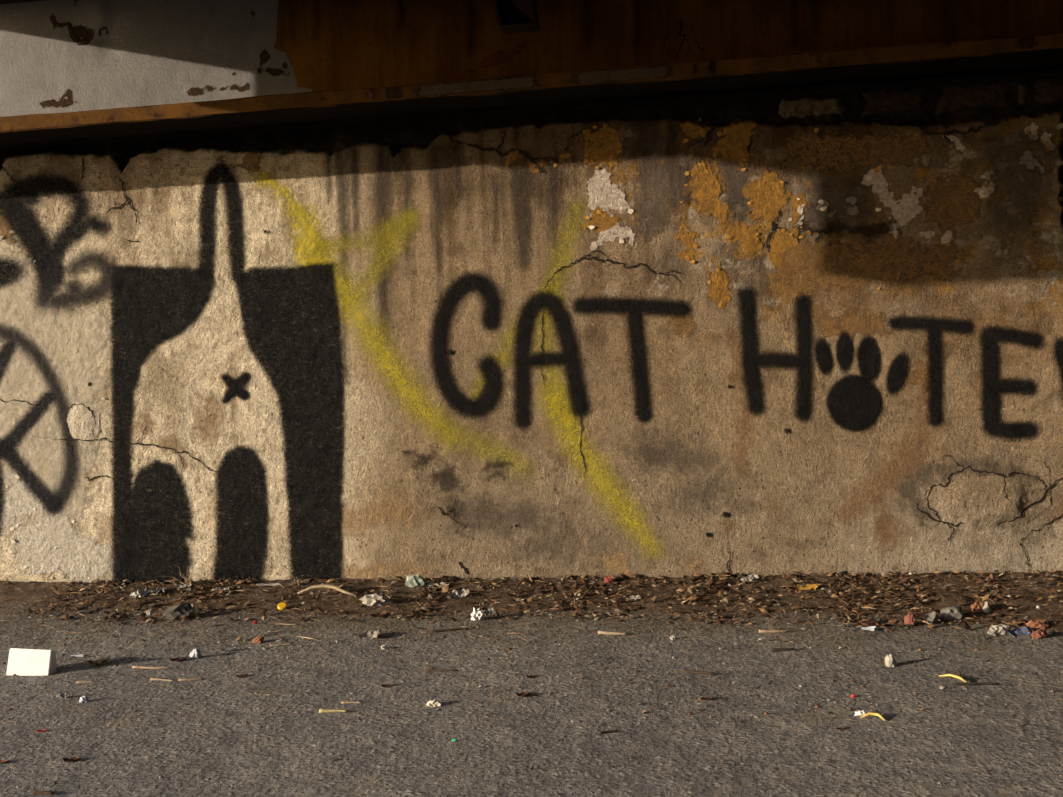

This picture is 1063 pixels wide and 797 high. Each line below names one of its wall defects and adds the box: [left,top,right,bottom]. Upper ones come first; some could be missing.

corrosion [40,89,76,108]
corrosion [50,14,109,45]
corrosion [187,72,250,96]
water stain [326,145,358,355]
water stain [375,144,410,327]
water stain [512,157,530,267]
peeling [679,118,859,275]
peeling [861,169,923,239]
peeling [1019,114,1063,174]
crack [540,250,682,382]
crack [35,403,223,481]
crack [917,455,1063,567]